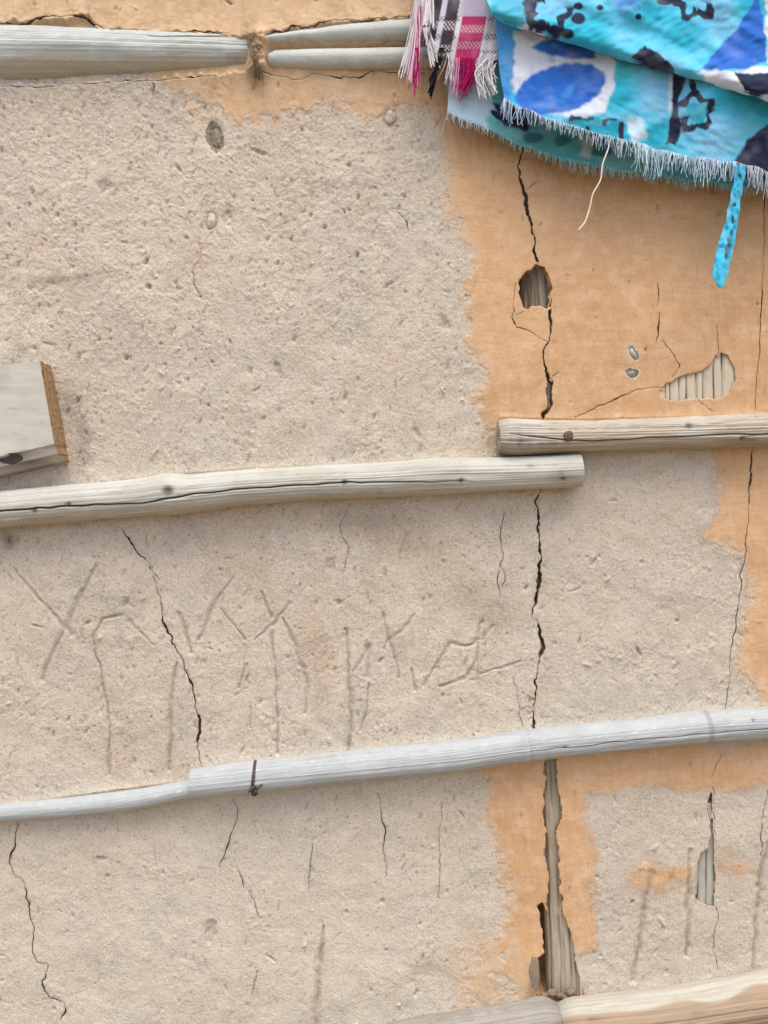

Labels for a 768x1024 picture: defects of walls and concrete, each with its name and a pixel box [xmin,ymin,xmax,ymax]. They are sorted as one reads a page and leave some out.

crack [516,147,540,265]
spalling [513,262,554,314]
crack [510,283,682,420]
peeling [623,344,640,380]
spalling [658,351,737,403]
crack [121,529,204,767]
crack [512,489,547,729]
peeling [533,448,768,727]
crack [724,449,754,709]
crack [8,821,68,1020]
peeling [575,774,768,995]